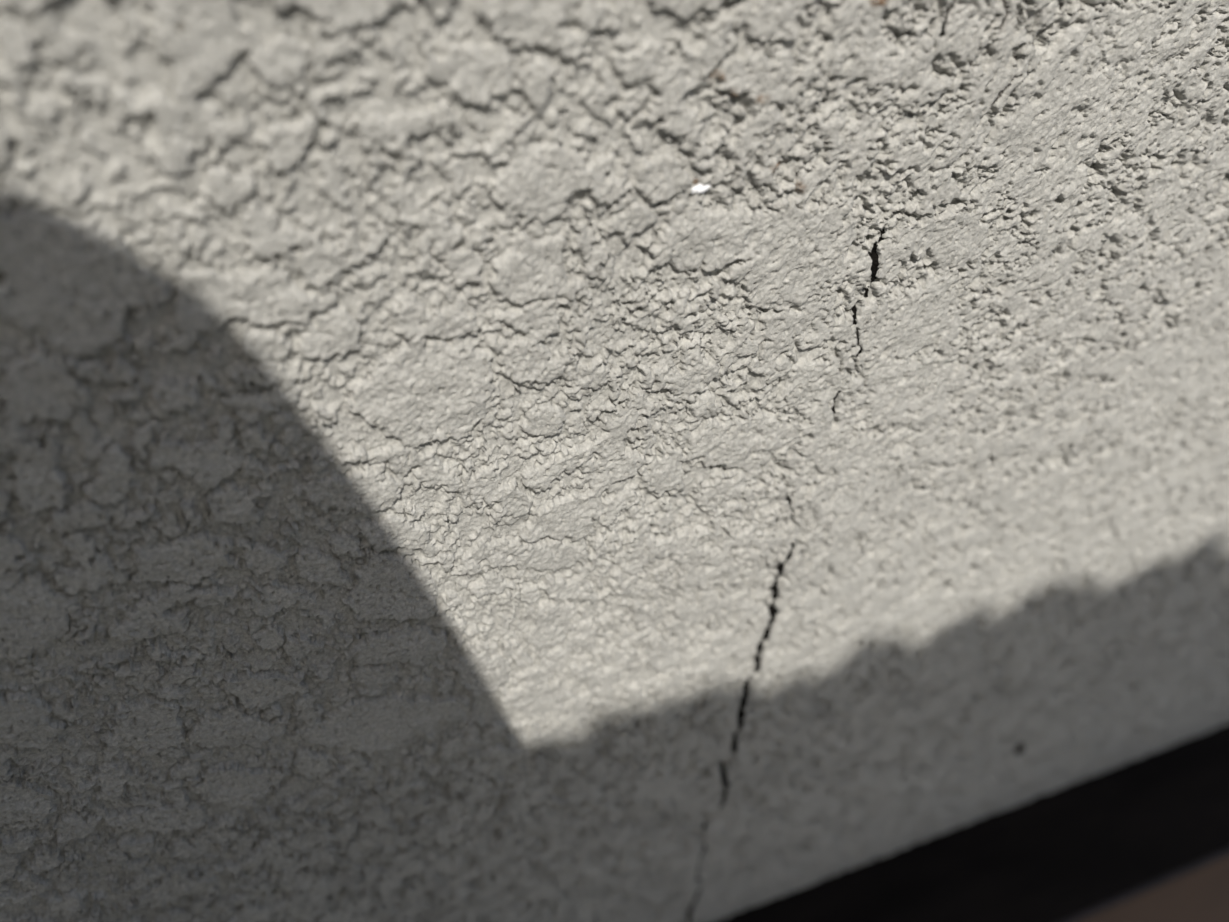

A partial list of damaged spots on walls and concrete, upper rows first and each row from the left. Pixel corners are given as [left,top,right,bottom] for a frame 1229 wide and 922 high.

crack [936,0,954,36]
crack [850,229,885,357]
crack [684,492,798,922]